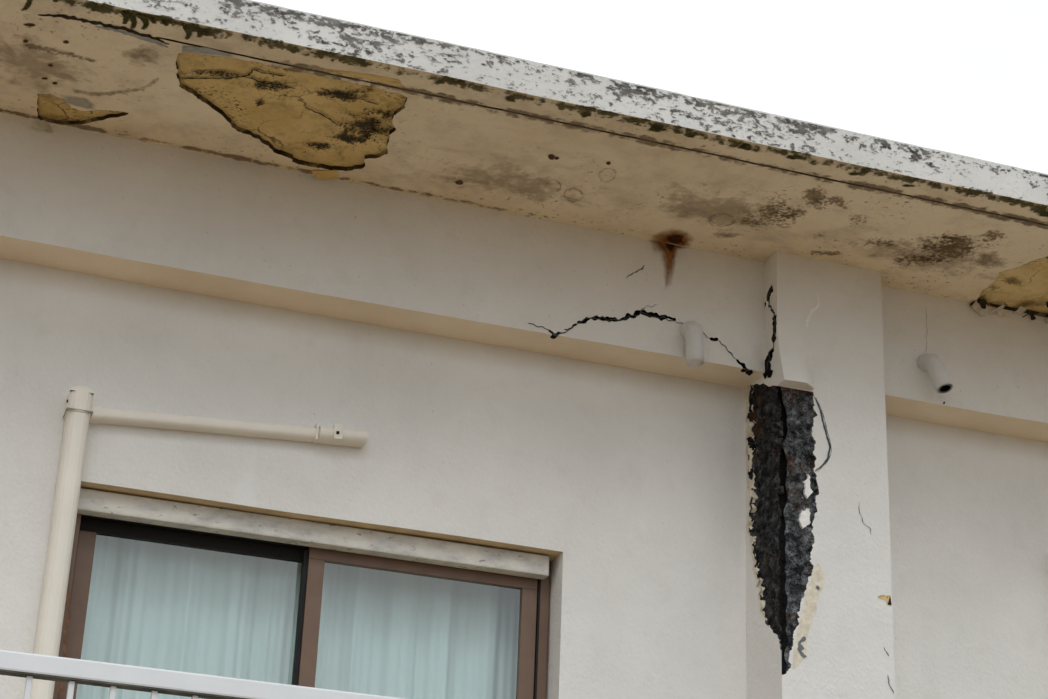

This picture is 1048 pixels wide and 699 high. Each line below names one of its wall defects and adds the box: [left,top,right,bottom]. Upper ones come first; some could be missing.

peeling [31,14,407,179]
crack [528,285,777,379]
corrosion [654,232,689,277]
water stain [866,231,1004,266]
peeling [970,256,1048,324]
crack [806,293,832,472]
spalling [745,383,825,675]